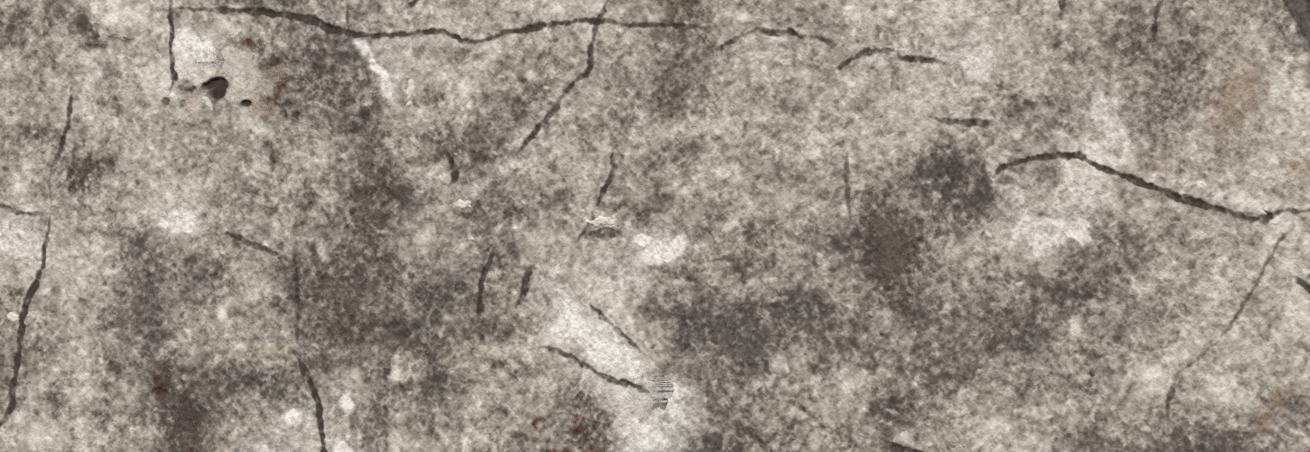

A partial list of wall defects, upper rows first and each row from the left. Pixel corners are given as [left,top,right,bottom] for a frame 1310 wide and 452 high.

crack [721,28,936,69]
crack [167,0,684,149]
crack [996,151,1310,274]
crack [1297,278,1310,294]
crack [0,205,50,426]
crack [592,307,638,348]
crack [547,347,643,392]
crack [300,362,328,452]
crack [888,442,923,452]